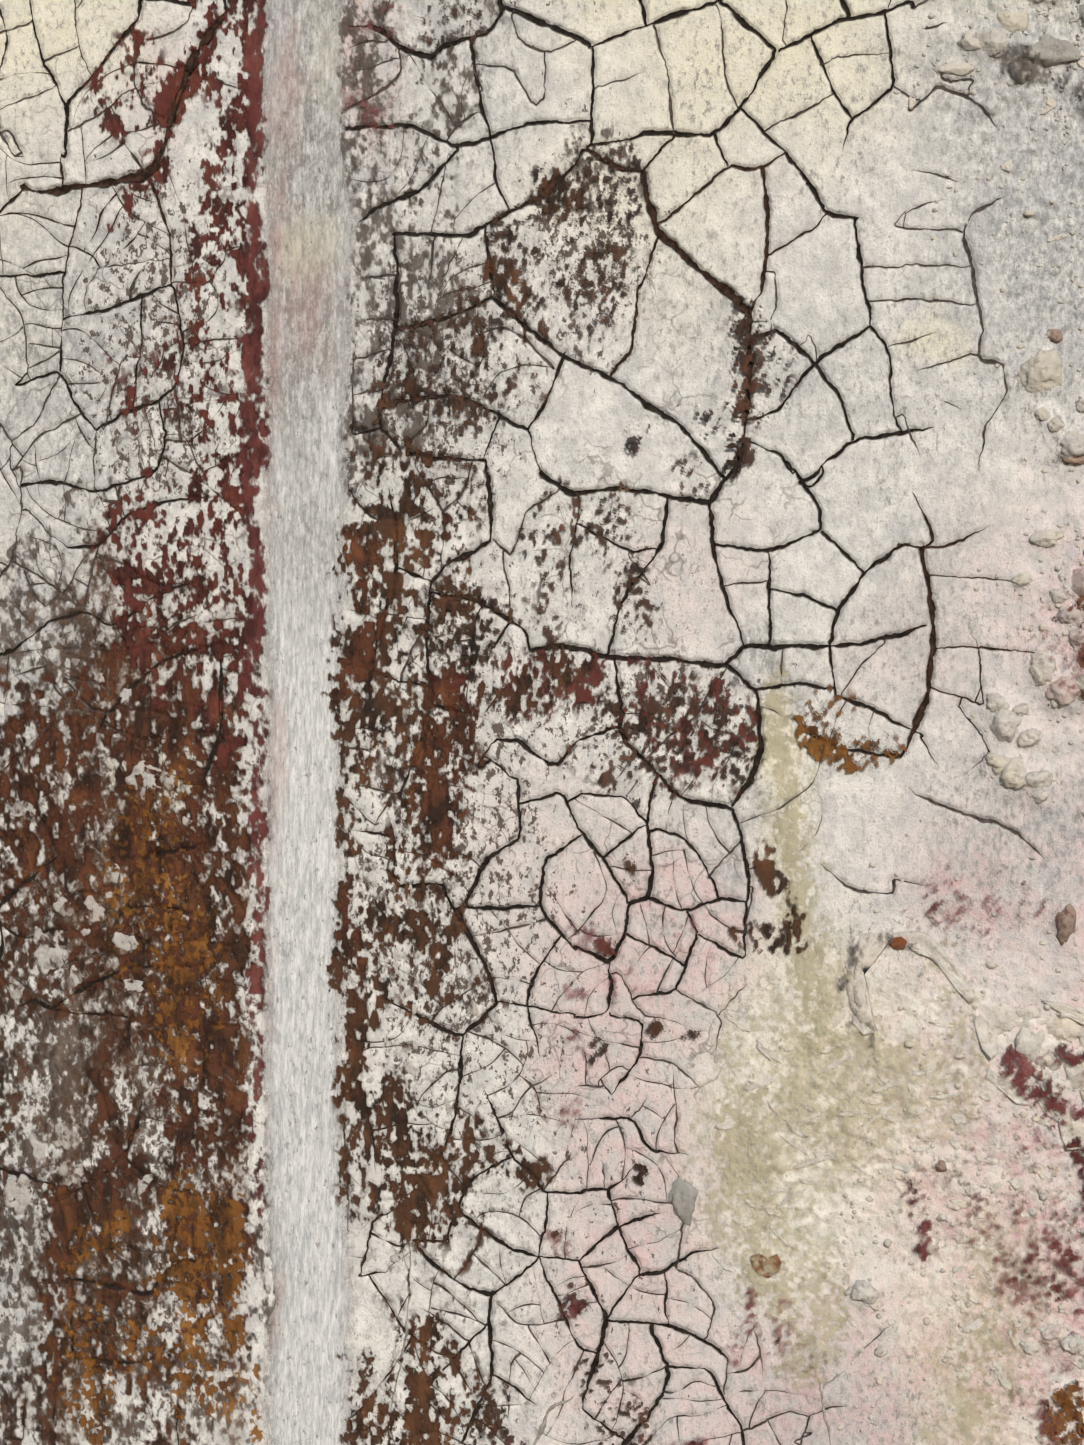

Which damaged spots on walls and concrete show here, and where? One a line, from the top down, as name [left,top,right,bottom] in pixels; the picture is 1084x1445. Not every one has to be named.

crack [0,0,249,1445]
peeling [0,559,265,1445]
rust [51,0,272,1445]
peeling [321,138,663,1445]
peeling [560,711,698,810]
crack [339,0,1044,1445]
peeling [669,295,798,506]
rust [793,684,907,775]
rust [1012,1388,1066,1445]
rust [1025,595,1084,701]